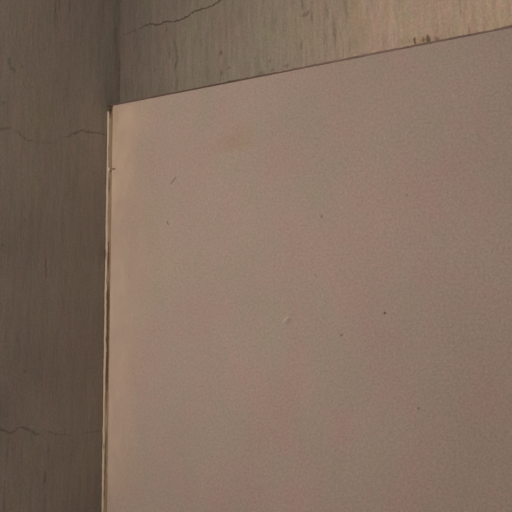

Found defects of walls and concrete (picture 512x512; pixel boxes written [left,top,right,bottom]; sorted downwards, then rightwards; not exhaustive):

crack [144,0,220,26]